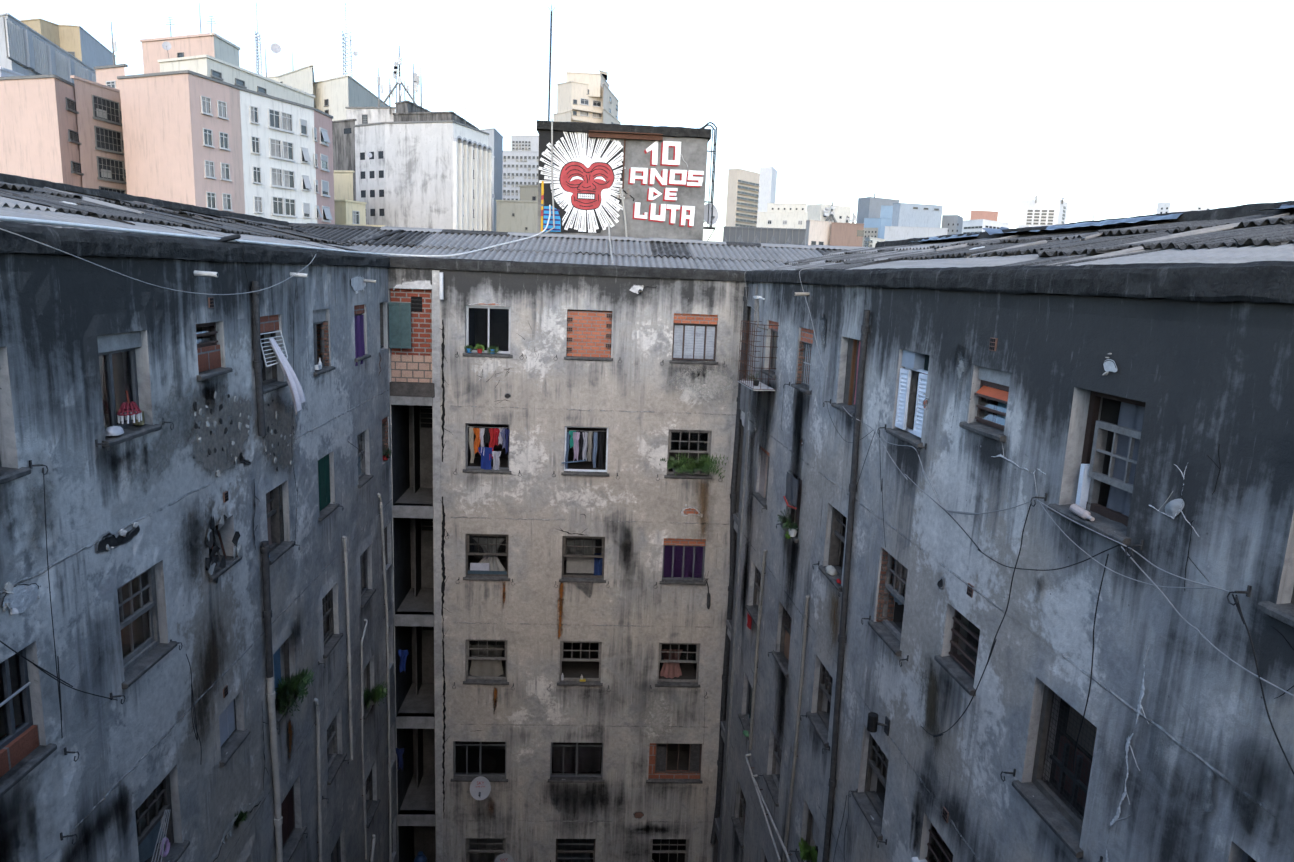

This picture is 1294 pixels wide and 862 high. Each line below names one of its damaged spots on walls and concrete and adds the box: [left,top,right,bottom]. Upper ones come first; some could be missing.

peeling [188,391,295,477]
crack [440,320,451,462]
crack [441,497,481,812]
water stain [926,664,937,742]